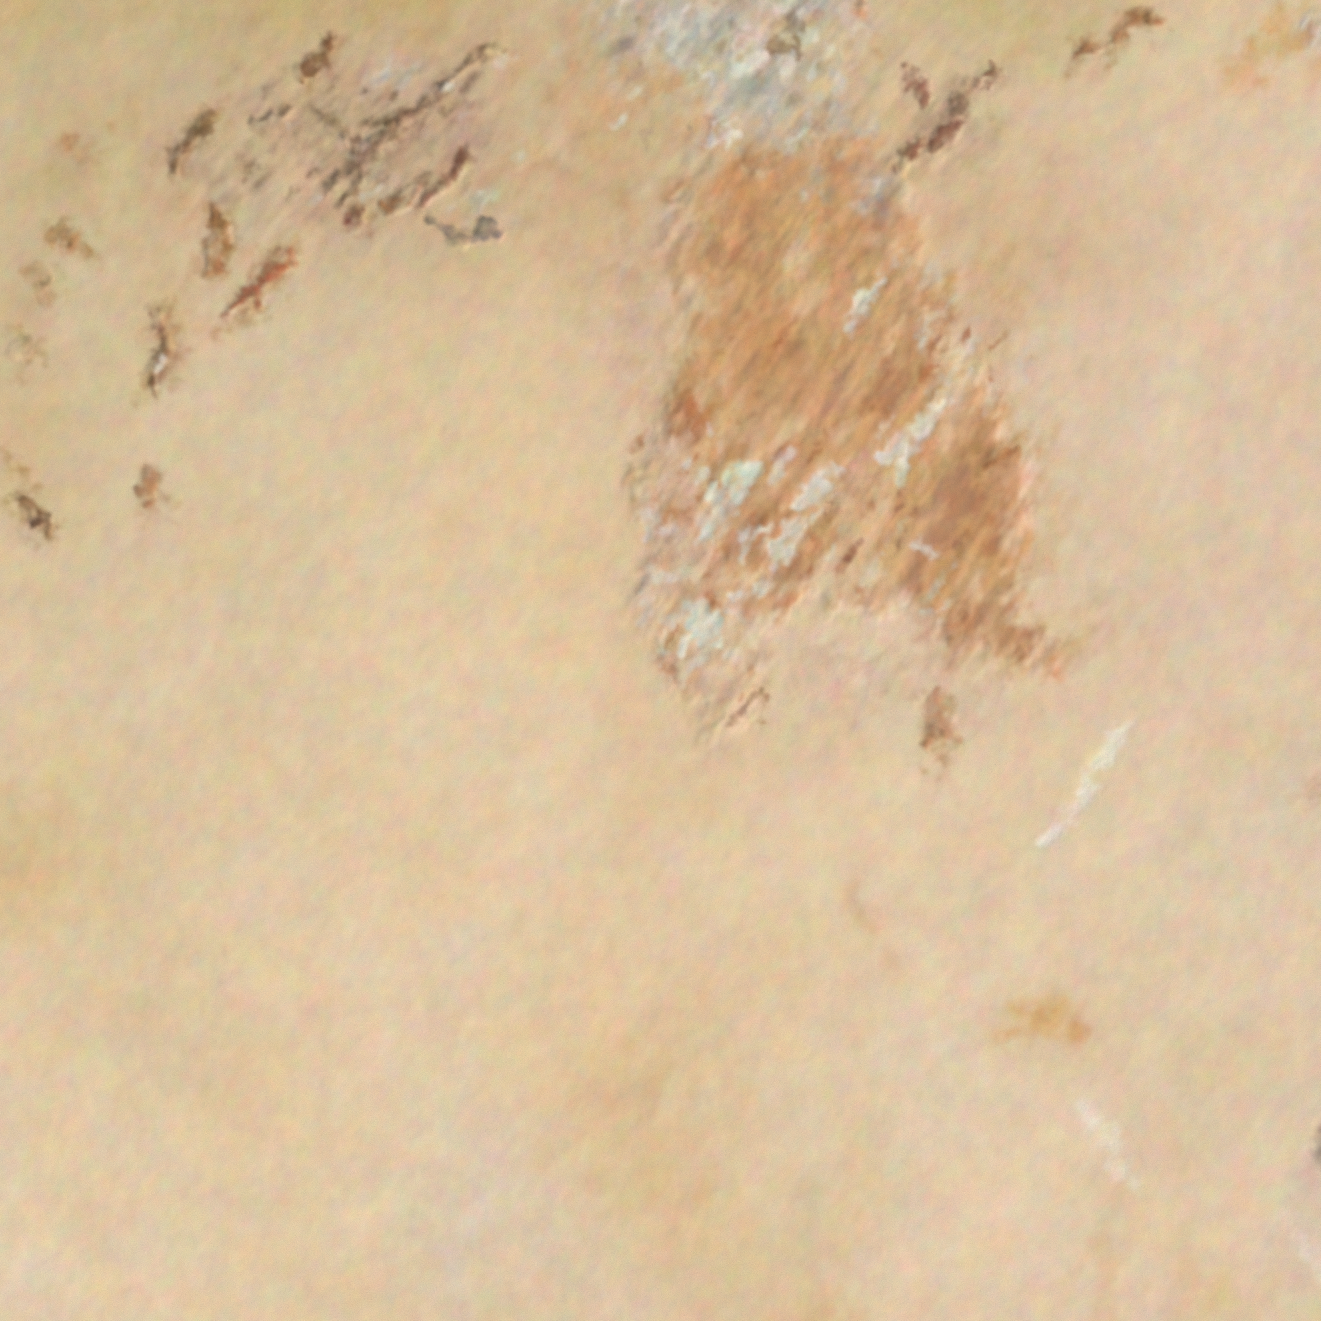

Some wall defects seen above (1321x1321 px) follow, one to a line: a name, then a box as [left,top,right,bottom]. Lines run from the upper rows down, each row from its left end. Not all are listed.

damp [0,0,445,85]
spalling [273,19,363,103]
damp [592,0,1109,170]
spalling [126,89,389,414]
spalling [422,174,534,253]
flaking render [575,34,1166,805]
peeling [1275,1113,1321,1200]